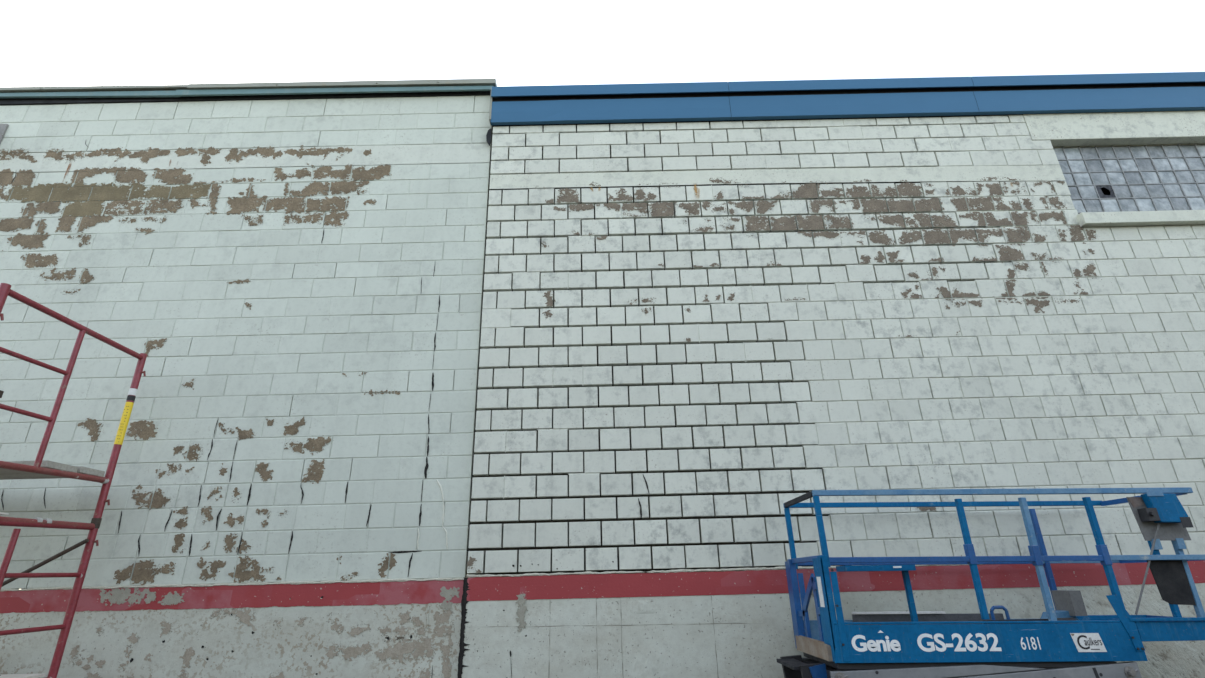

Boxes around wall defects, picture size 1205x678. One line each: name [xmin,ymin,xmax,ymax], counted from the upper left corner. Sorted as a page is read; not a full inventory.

peeling [0,145,392,293]
peeling [542,291,556,318]
peeling [126,420,158,440]
peeling [218,422,254,441]
peeling [266,417,334,484]
crack [388,266,440,576]
crack [118,417,252,557]
peeling [99,444,287,607]
crack [345,482,372,526]
peeling [378,553,397,578]
peeling [70,632,153,678]
peeling [179,645,208,678]